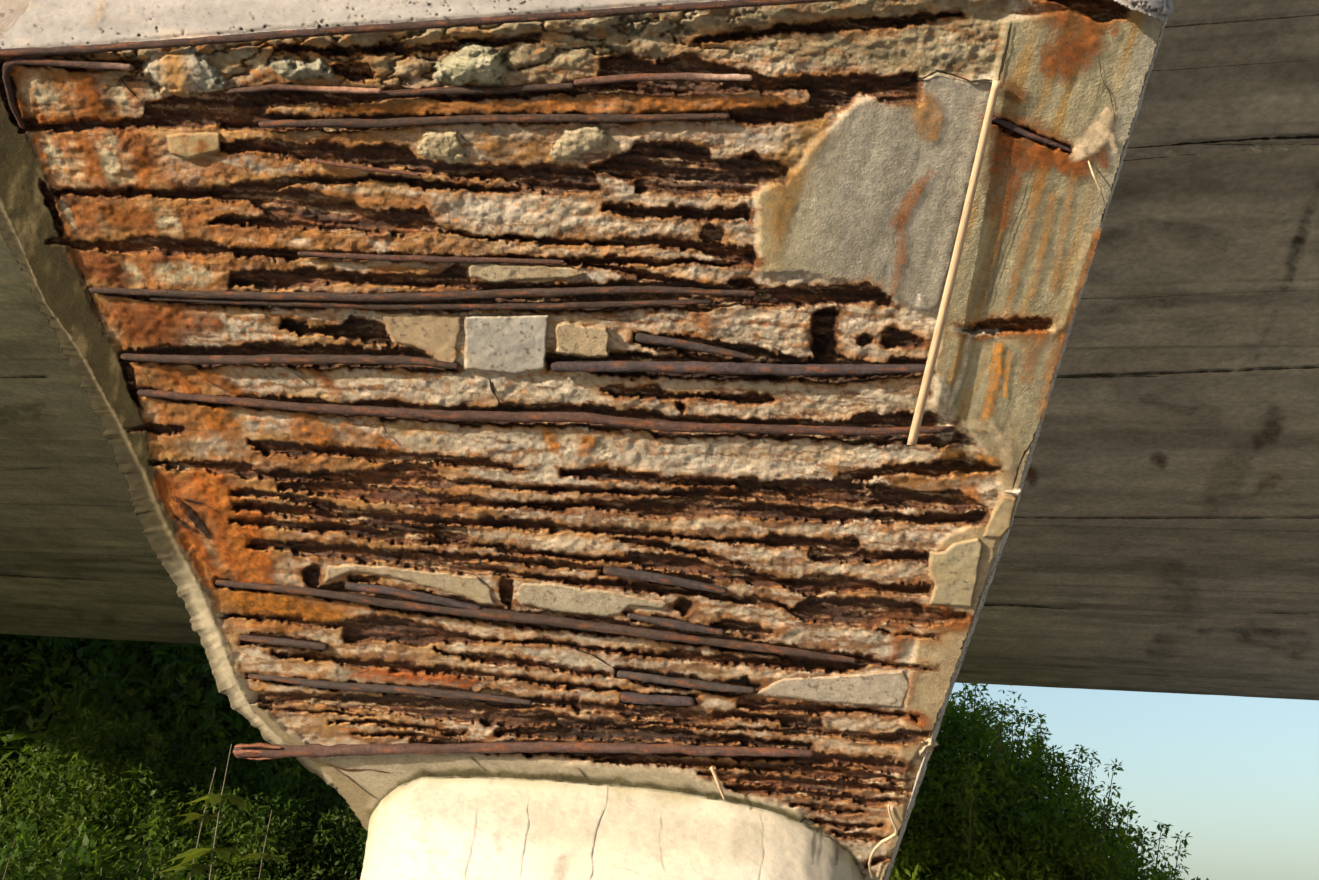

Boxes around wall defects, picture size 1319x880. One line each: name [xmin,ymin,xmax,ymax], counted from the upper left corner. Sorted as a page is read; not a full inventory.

spalling [0,0,30,39]
crack [904,23,1012,84]
corrosion [1028,0,1118,86]
spalling [1050,0,1128,22]
corrosion [322,96,800,115]
spalling [992,118,1073,153]
corrosion [959,115,1108,430]
spalling [967,318,1054,335]
spalling [0,12,1023,868]
corrosion [893,448,997,502]
corrosion [156,471,341,633]
crack [577,767,675,878]